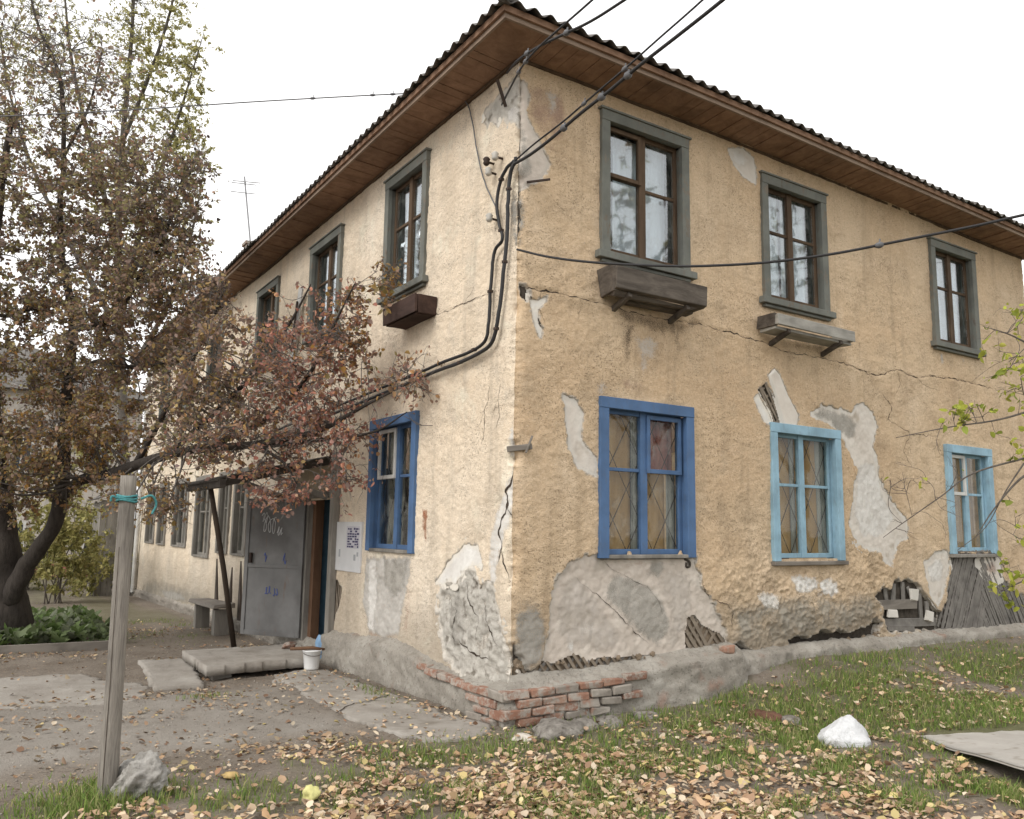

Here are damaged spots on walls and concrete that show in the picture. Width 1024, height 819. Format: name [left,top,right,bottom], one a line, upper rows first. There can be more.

peeling [481,77,550,192]
peeling [728,148,756,184]
spalling [519,286,546,338]
crack [498,475,513,576]
peeling [562,394,597,476]
crack [527,287,986,467]
peeling [754,391,773,423]
peeling [810,403,910,566]
spalling [416,537,648,728]
spalling [542,551,727,663]
peeling [924,550,952,609]